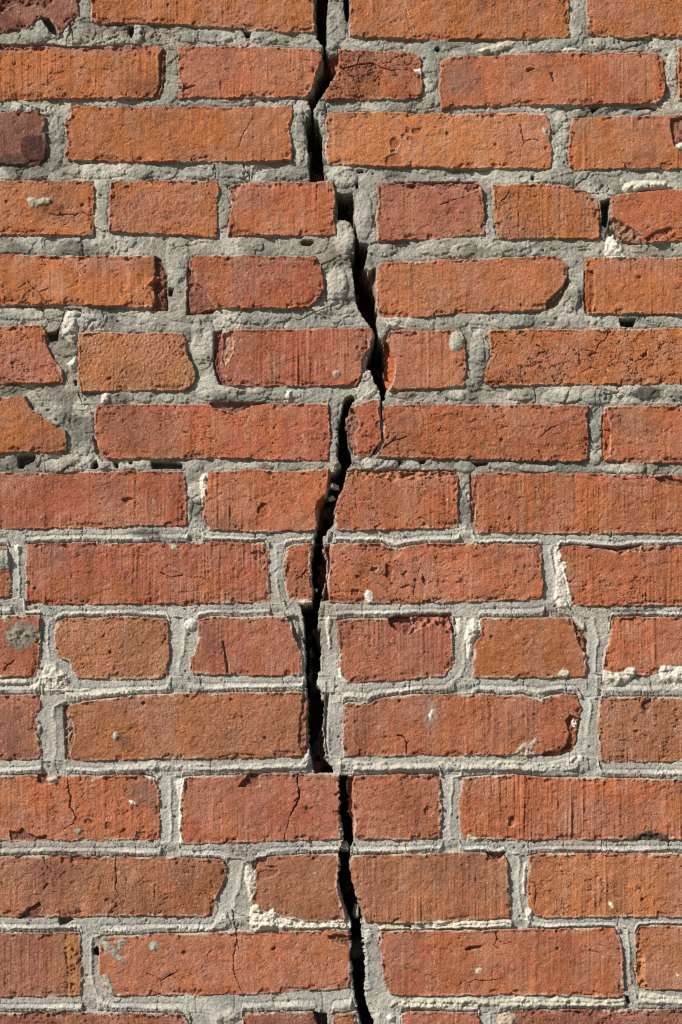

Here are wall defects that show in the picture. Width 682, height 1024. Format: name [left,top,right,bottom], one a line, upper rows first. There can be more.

crack [284,0,414,1024]